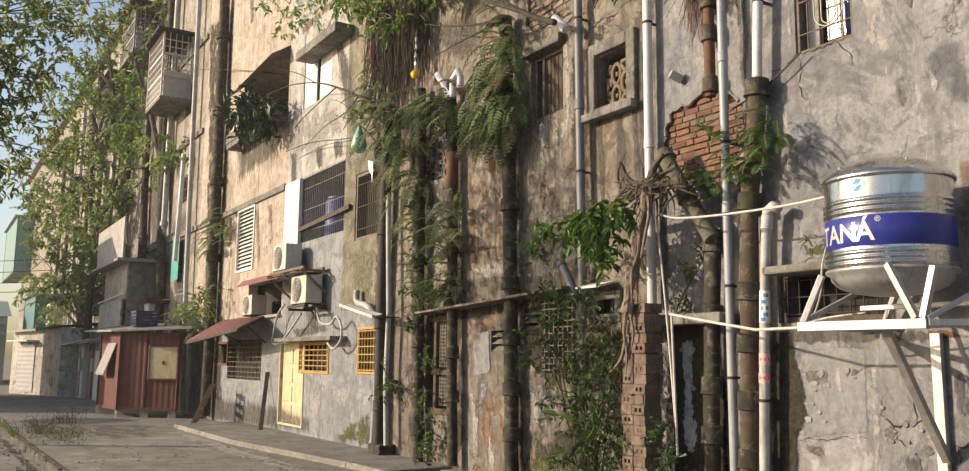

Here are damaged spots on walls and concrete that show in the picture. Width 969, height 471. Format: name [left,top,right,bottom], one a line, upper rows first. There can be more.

flaking render [525,0,574,32]
crack [769,36,853,100]
flaking render [662,89,747,185]
water stain [408,116,504,453]
peeling [679,340,697,452]
crack [880,393,922,448]